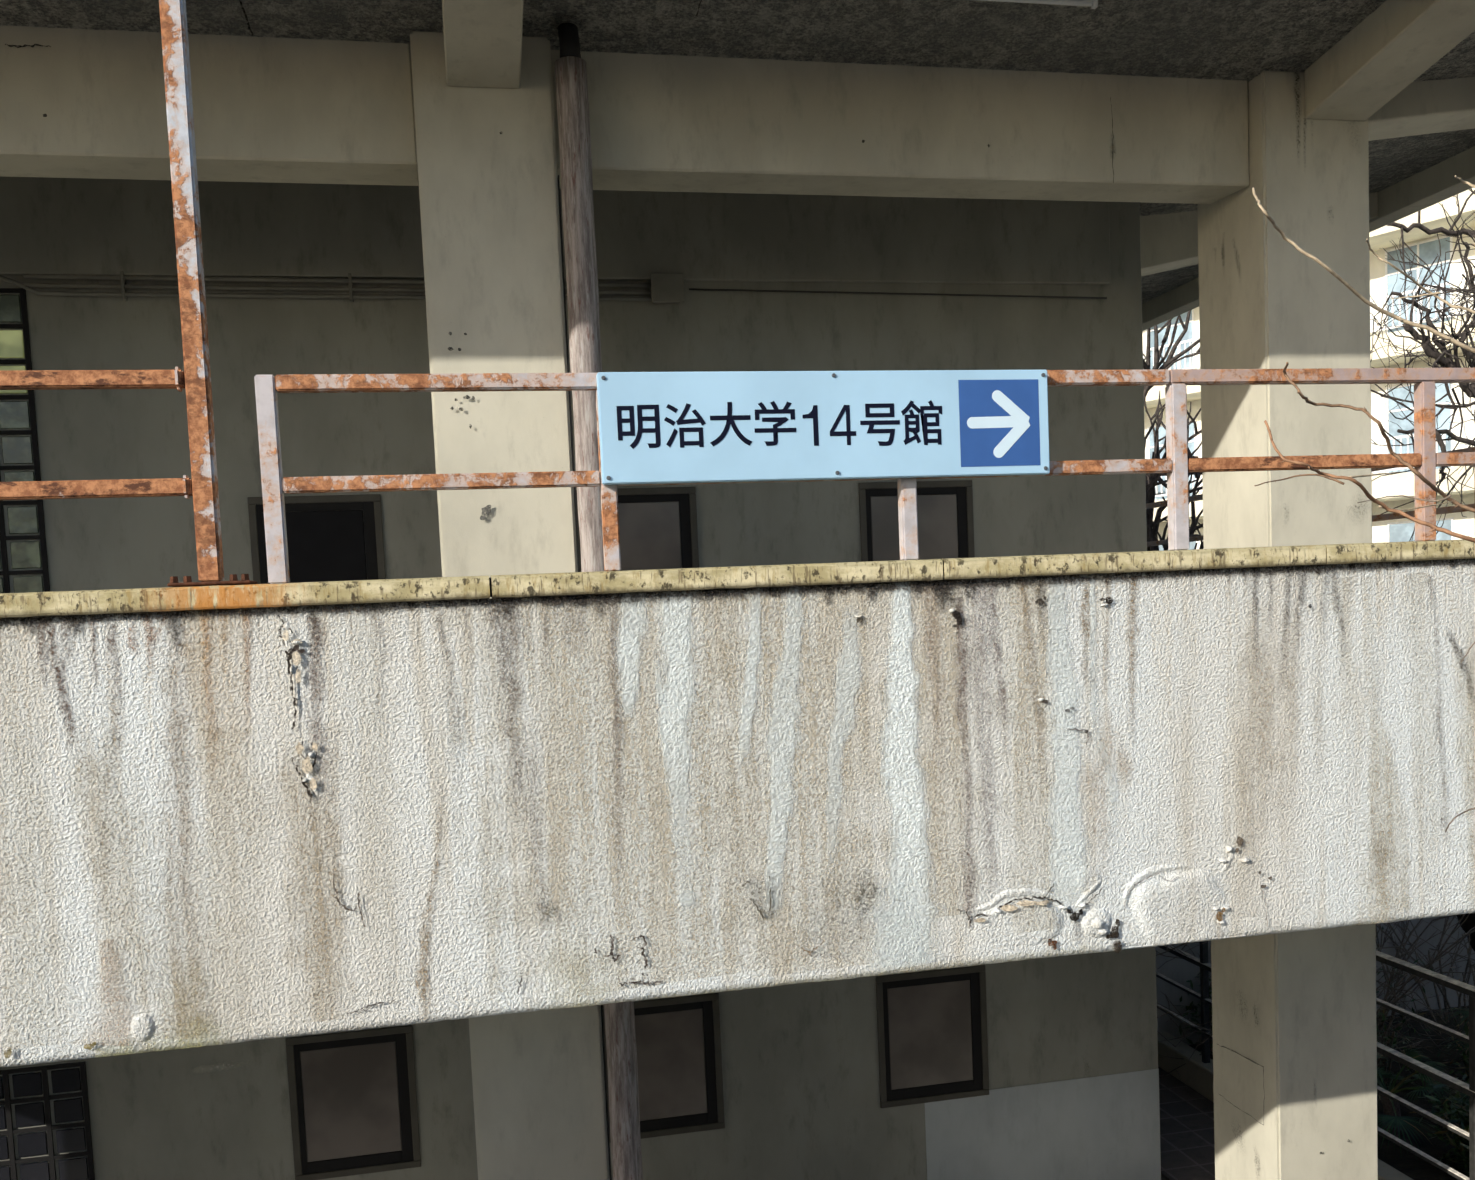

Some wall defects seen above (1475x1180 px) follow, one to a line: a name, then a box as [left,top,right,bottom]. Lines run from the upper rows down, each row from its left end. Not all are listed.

spalling [282,630,306,683]
spalling [296,742,318,790]
leakage [0,559,1475,1021]
crack [956,851,1234,927]